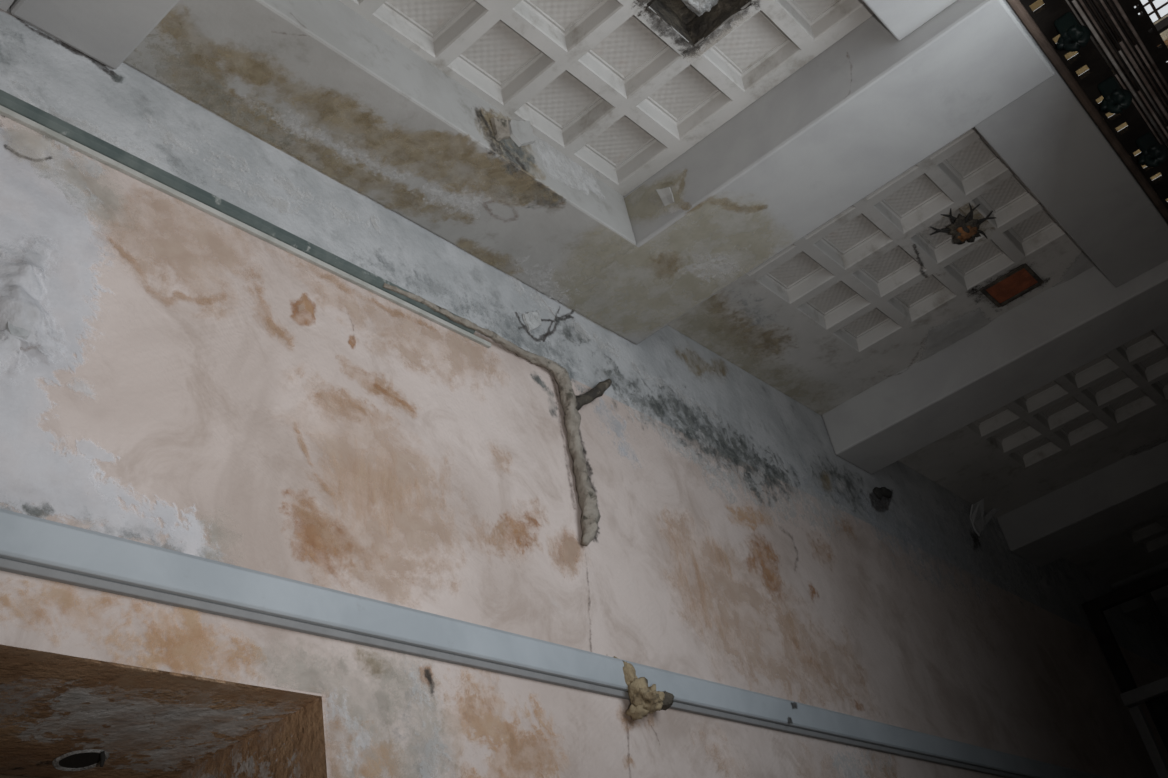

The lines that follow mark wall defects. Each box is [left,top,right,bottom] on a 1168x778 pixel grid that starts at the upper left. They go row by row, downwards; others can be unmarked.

spalling [637,0,759,56]
water stain [171,44,558,220]
spalling [476,108,600,220]
water stain [458,178,808,397]
water stain [604,358,800,503]
water stain [23,505,53,517]
water stain [322,428,452,595]
water stain [8,650,69,668]
water stain [103,608,321,706]
water stain [667,519,861,710]